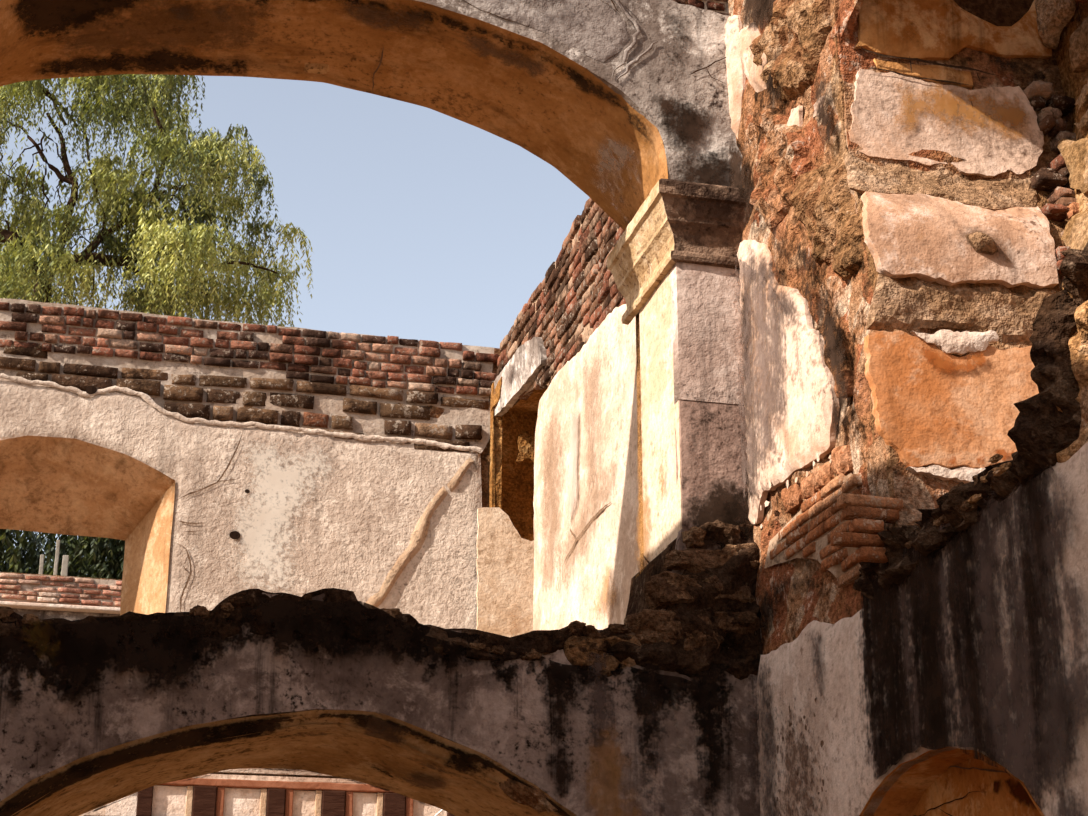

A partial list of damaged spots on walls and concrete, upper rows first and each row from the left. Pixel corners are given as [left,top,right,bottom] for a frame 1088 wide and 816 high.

water stain [11,0,269,75]
water stain [345,0,648,140]
water stain [658,96,762,225]
spalling [749,0,1037,280]
spalling [866,273,1056,356]
water stain [682,229,847,540]
peeling [967,454,1012,504]
water stain [0,443,733,816]
spalling [563,635,641,678]
water stain [859,465,1088,816]
crack [914,766,1008,816]